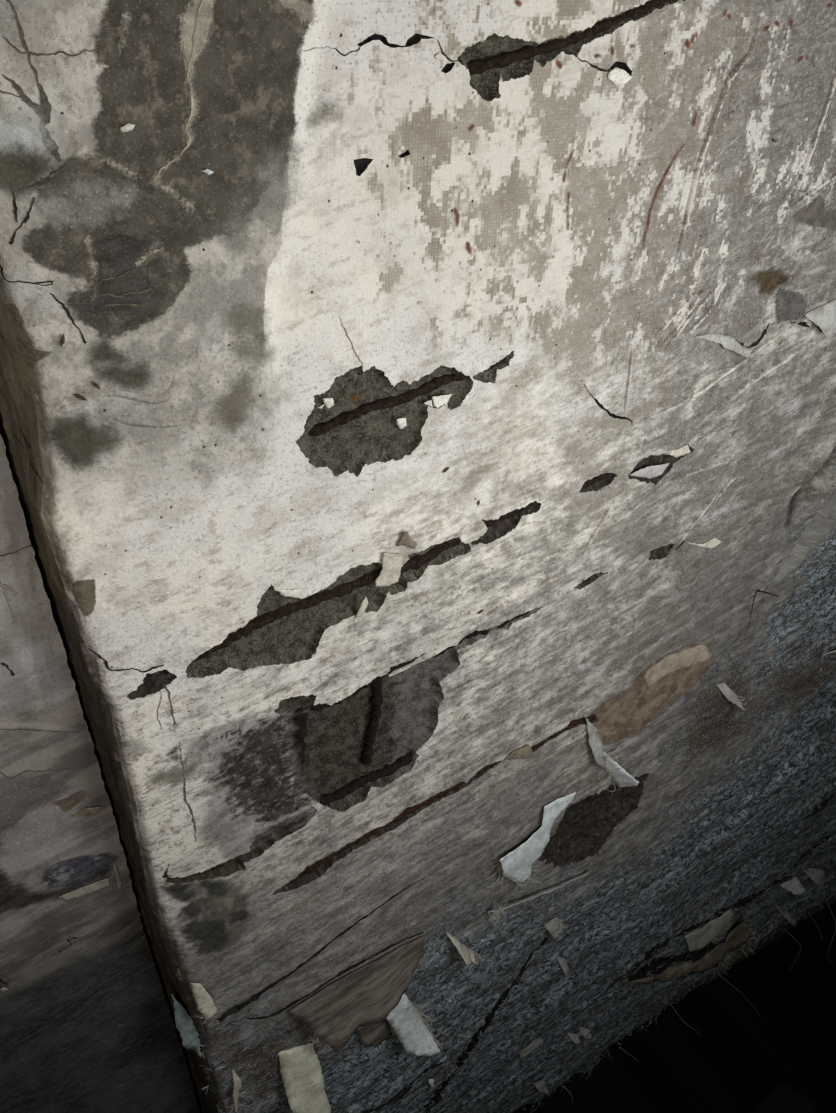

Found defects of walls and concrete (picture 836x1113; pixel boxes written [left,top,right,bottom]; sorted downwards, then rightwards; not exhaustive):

leakage [80,0,214,211]
leakage [279,0,315,25]
crack [307,33,459,73]
crack [576,56,610,72]
crack [0,0,96,344]
leakage [92,341,149,389]
leakage [213,379,253,432]
spalling [296,351,514,477]
spalling [580,444,694,493]
spalling [127,501,541,700]
spalling [162,605,545,883]
flaking render [273,643,712,924]